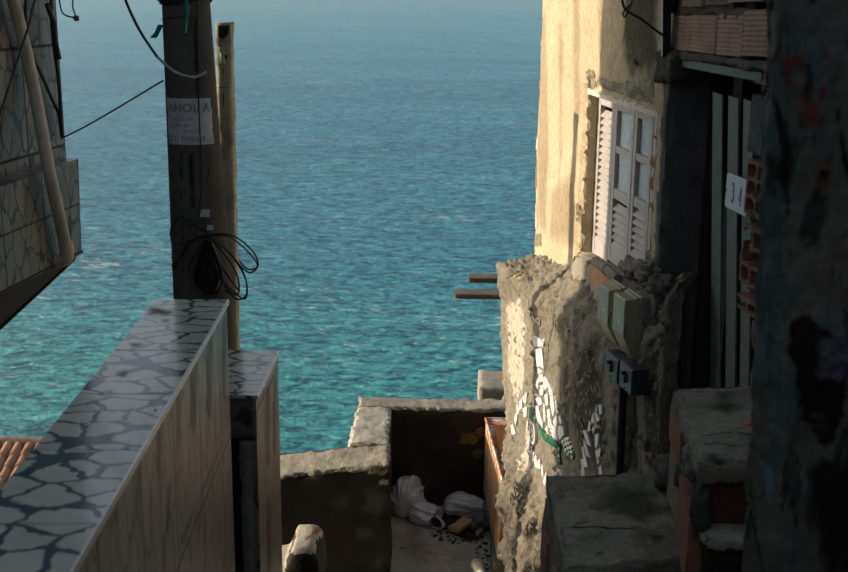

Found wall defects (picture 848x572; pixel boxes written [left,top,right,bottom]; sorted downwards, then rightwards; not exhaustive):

crack [563,521,641,529]